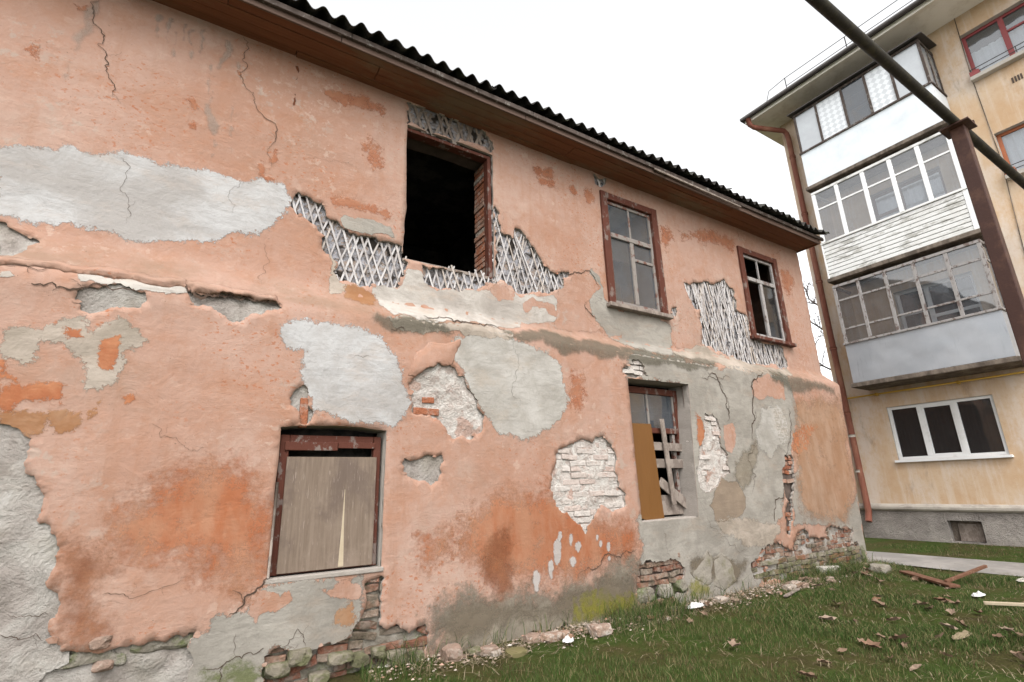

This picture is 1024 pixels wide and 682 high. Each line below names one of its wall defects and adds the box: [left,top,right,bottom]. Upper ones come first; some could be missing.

crack [91,1,120,100]
crack [240,39,278,165]
peeling [258,149,278,183]
flaking render [0,223,40,256]
peeling [291,193,568,341]
flaking render [0,274,280,682]
flaking render [290,385,313,428]
flaking render [401,455,443,485]
flaking render [408,364,483,440]
flaking render [550,436,627,534]
crack [705,372,784,519]
flaking render [670,279,870,583]